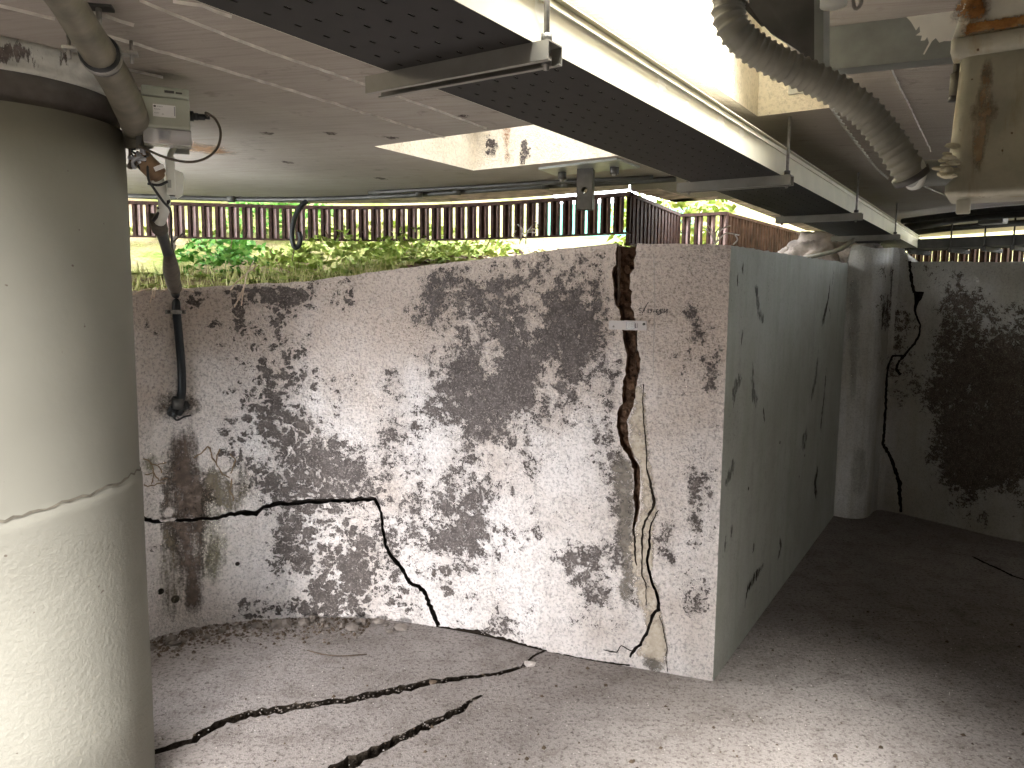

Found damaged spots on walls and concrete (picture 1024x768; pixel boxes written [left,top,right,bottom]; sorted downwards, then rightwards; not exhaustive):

corrosion [972,63,997,165]
peeling [184,291,209,310]
damp [159,431,248,612]
crack [144,247,668,768]
peeling [207,250,723,664]
damp [611,452,635,602]
crack [881,261,924,512]